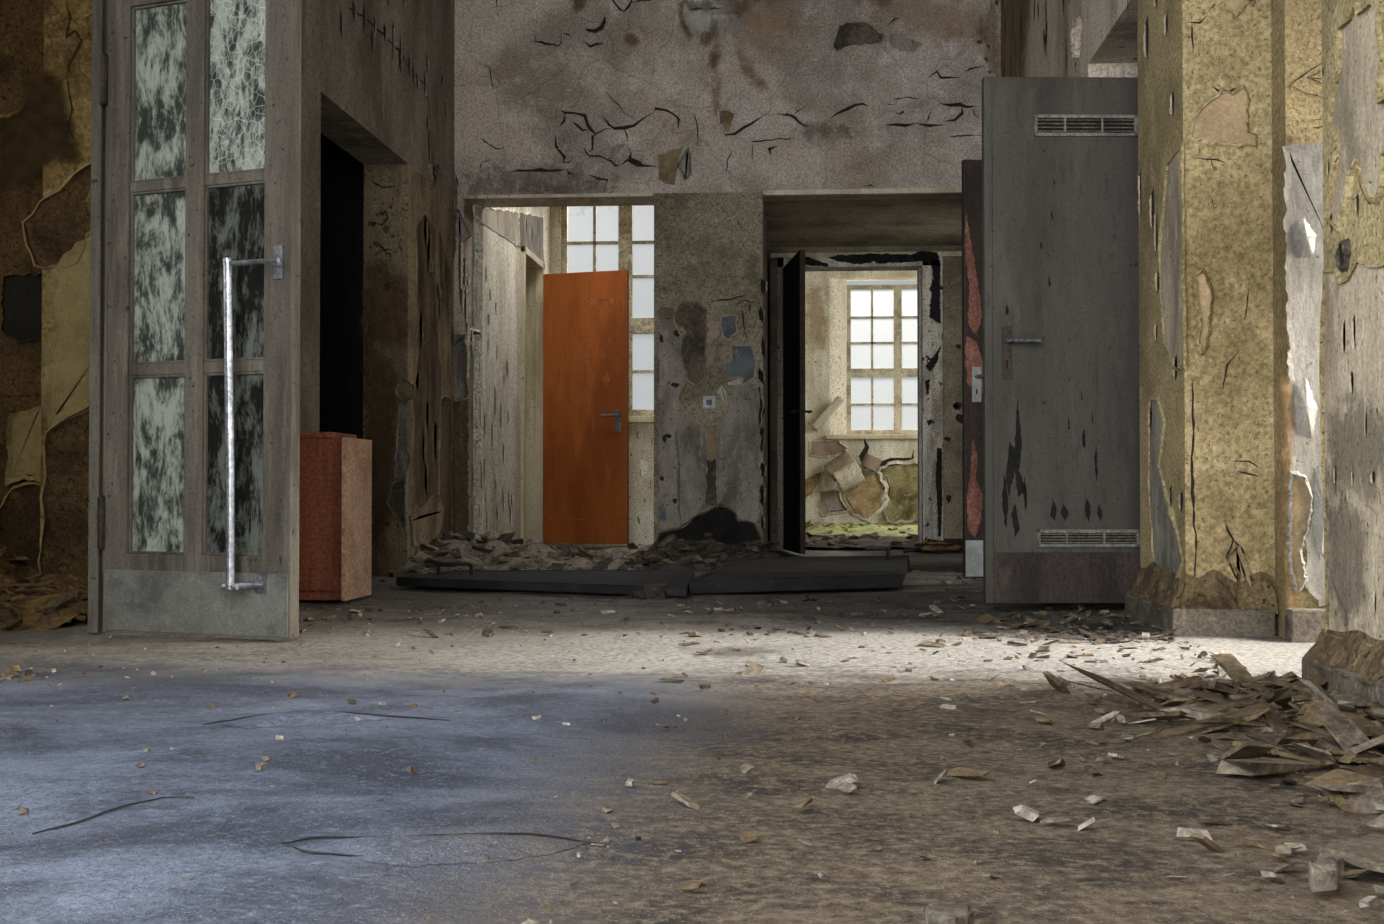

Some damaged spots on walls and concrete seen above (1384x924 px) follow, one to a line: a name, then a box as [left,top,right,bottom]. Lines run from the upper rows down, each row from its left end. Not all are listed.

peeling [0,0,44,118]
peeling [831,21,925,54]
peeling [976,0,1082,77]
peeling [1143,0,1168,63]
crack [455,66,983,186]
peeling [0,162,91,583]
peeling [636,279,768,549]
peeling [805,396,918,524]
peeling [1282,0,1384,647]